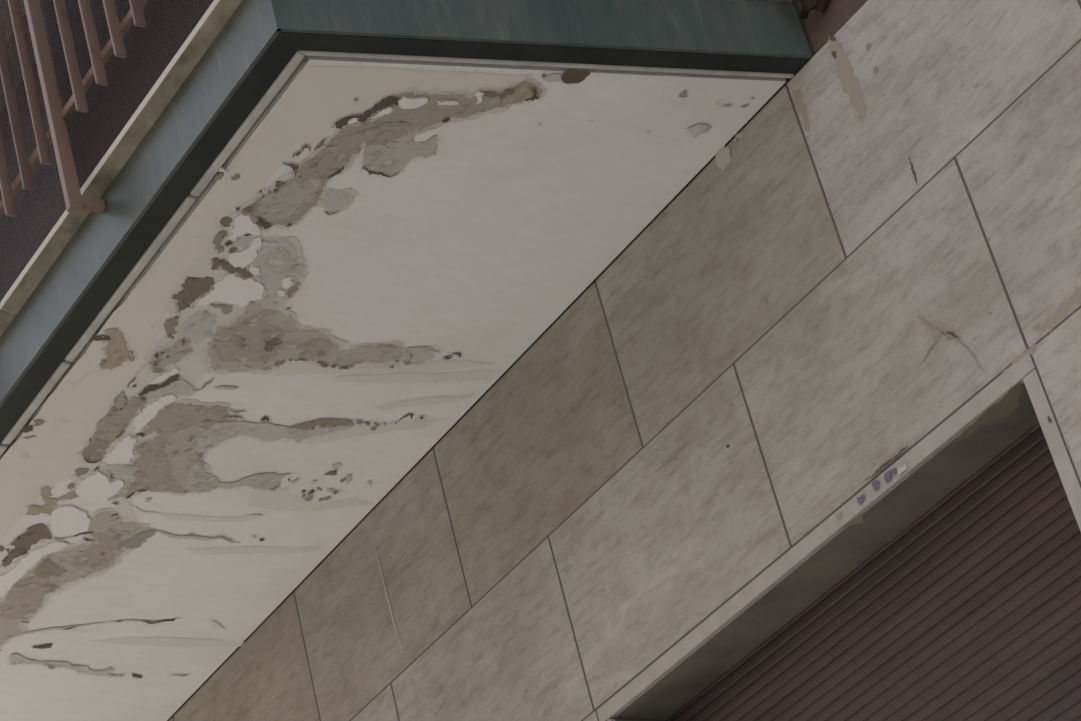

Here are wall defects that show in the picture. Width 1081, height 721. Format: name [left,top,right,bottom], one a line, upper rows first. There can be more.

peeling [0,74,545,645]
crack [919,316,985,372]
peeling [10,644,142,678]